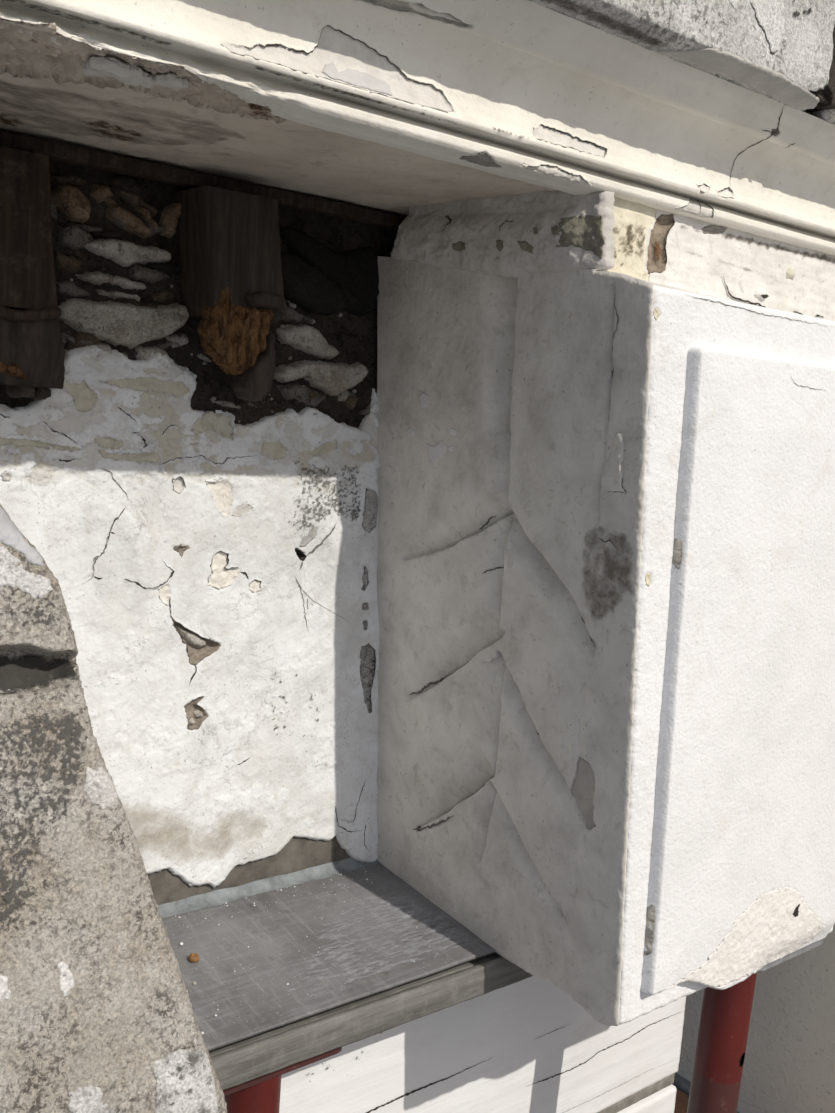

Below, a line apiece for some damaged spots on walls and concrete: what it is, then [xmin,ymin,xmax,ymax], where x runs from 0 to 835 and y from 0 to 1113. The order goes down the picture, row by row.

flaking render [0,14,288,124]
peeling [220,19,457,115]
crack [730,109,795,179]
peeling [517,215,605,259]
crack [118,407,257,466]
peeling [0,506,53,599]
crack [41,421,176,617]
crack [295,522,346,631]
flaking render [170,614,221,730]
flaking render [665,887,826,990]
crack [366,1058,492,1113]
crack [528,1010,685,1086]